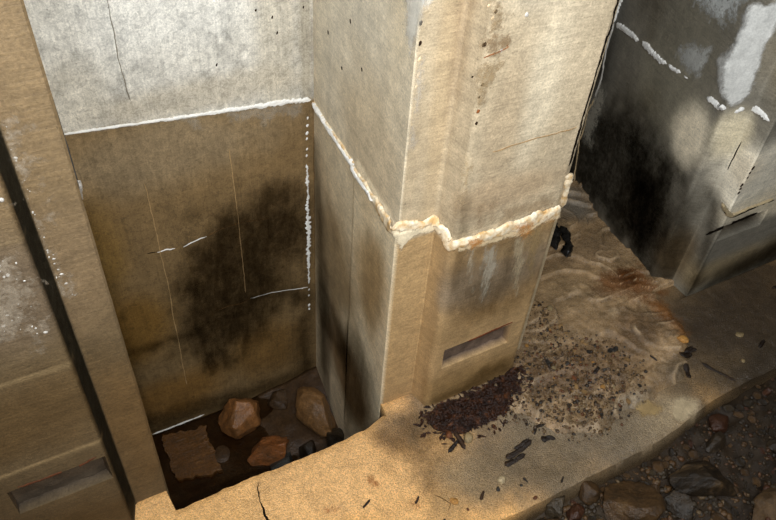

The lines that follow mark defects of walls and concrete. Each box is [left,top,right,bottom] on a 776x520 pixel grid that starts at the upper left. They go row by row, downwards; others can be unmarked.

rust [53,99,83,200]
damp [64,97,679,366]
crack [257,484,269,520]